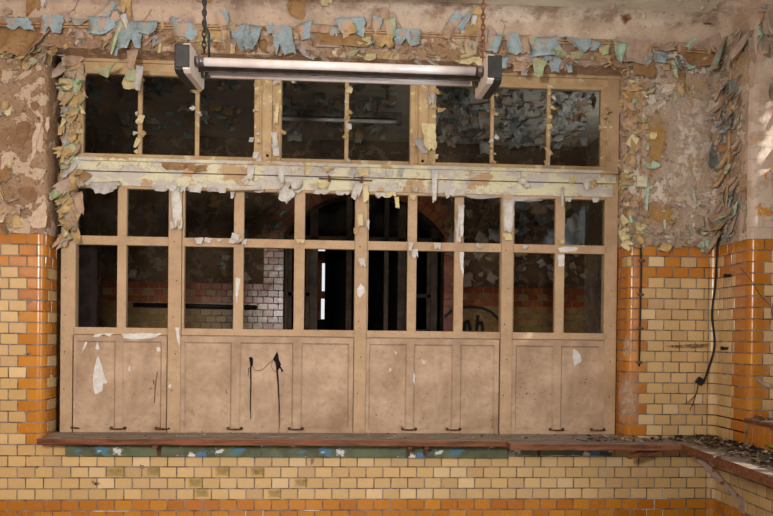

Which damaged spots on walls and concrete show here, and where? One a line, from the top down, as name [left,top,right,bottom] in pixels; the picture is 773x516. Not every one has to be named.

peeling [0,0,773,255]
peeling [218,254,251,303]
peeling [431,170,600,288]